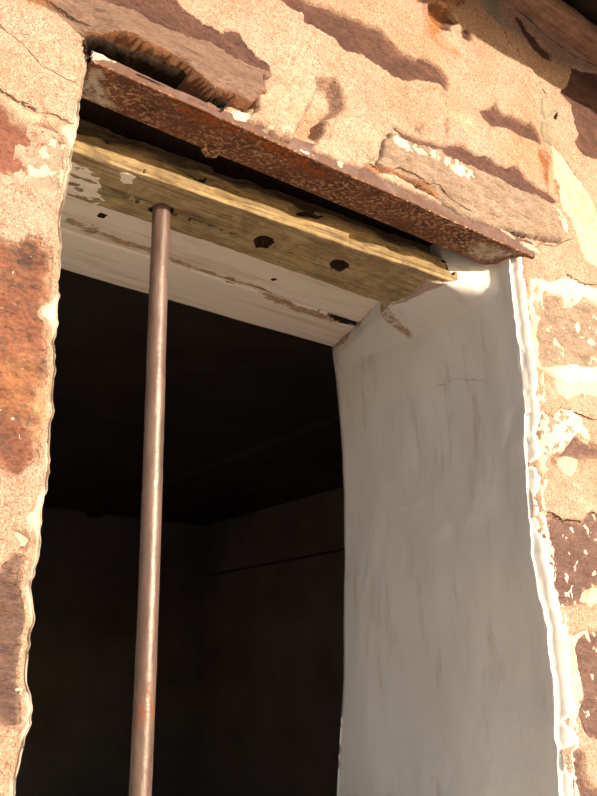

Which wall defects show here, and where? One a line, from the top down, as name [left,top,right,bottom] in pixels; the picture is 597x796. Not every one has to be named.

flaking render [0,104,68,200]
crack [0,88,74,134]
corrosion [173,102,334,178]
flaking render [391,126,556,204]
flaking render [536,294,597,368]
flaking render [550,435,597,464]
flaking render [542,513,597,607]
flaking render [575,631,597,739]
flaking render [572,750,597,796]